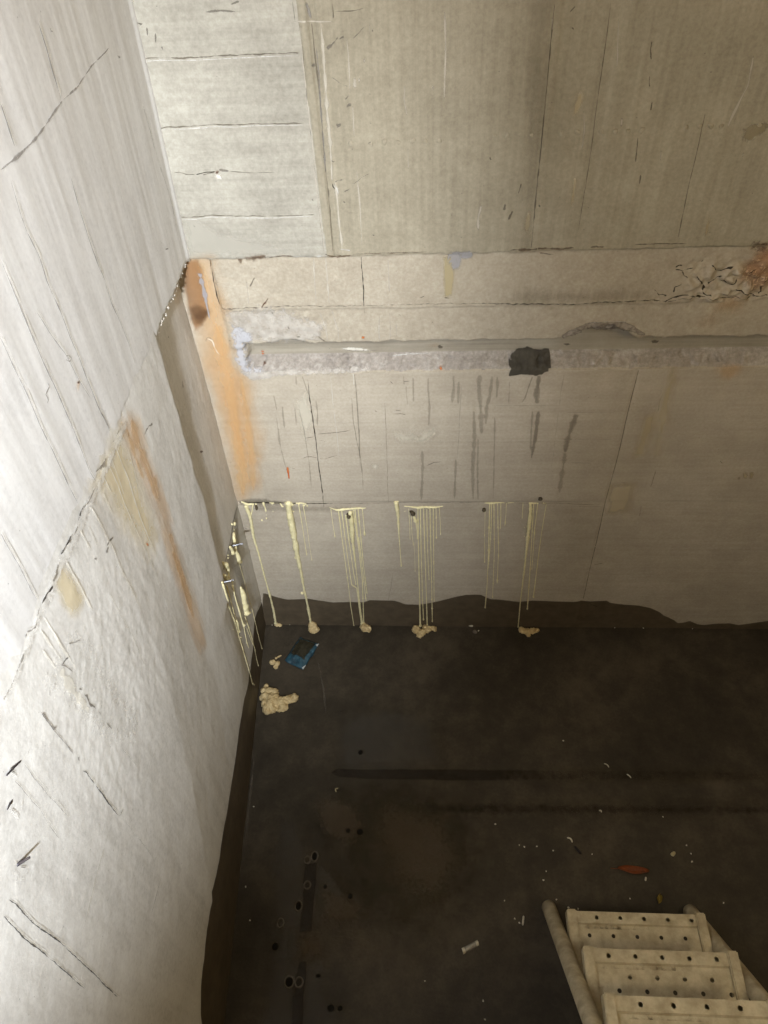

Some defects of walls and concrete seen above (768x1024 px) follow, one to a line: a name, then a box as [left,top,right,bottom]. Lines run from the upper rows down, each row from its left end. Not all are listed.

crack [1,22,110,503]
rust [186,262,207,326]
crack [144,4,767,313]
crack [4,900,119,996]